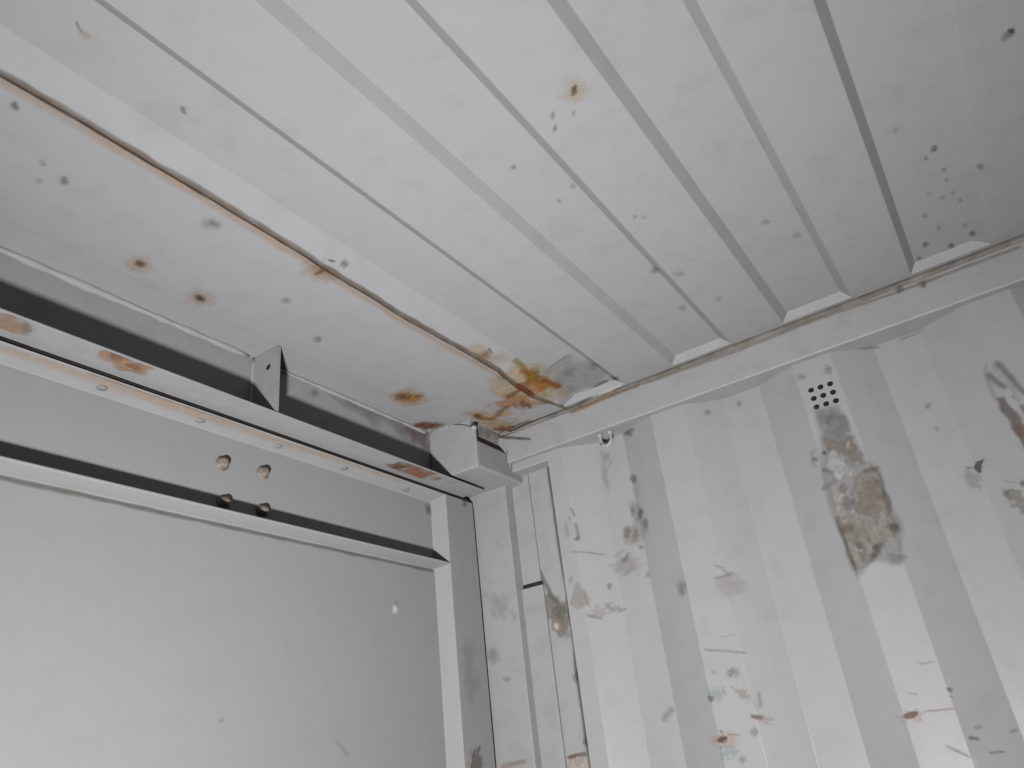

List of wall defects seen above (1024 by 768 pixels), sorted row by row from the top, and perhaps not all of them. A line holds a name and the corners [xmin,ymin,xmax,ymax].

rust [101,351,152,374]
rust [470,360,561,440]
rust [389,464,436,478]